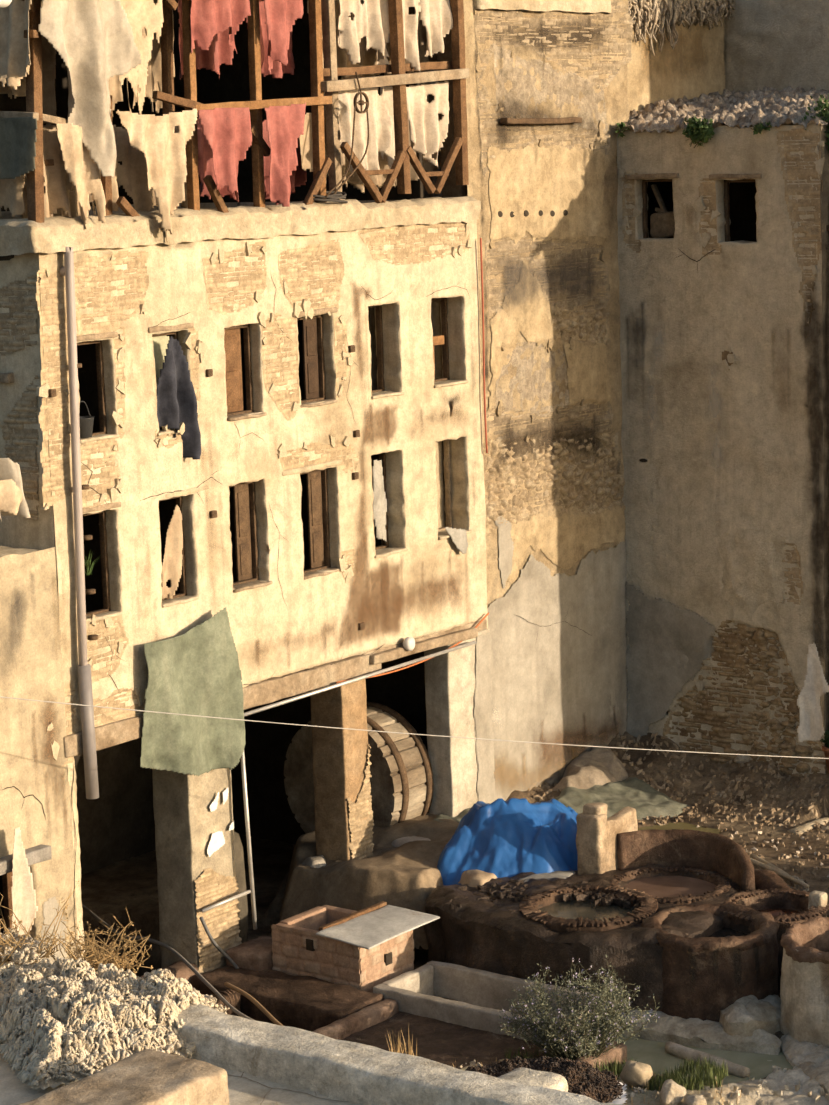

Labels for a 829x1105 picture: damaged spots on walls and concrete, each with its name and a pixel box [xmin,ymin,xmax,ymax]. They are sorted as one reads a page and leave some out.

spalling [777,128,825,324]
spalling [202,240,353,421]
damp [355,288,368,358]
damp [507,260,594,302]
damp [364,407,395,444]
damp [803,242,829,731]
damp [341,496,459,644]
spalling [86,613,129,682]
spalling [46,681,80,767]
spalling [93,687,146,727]
crack [3,766,77,937]